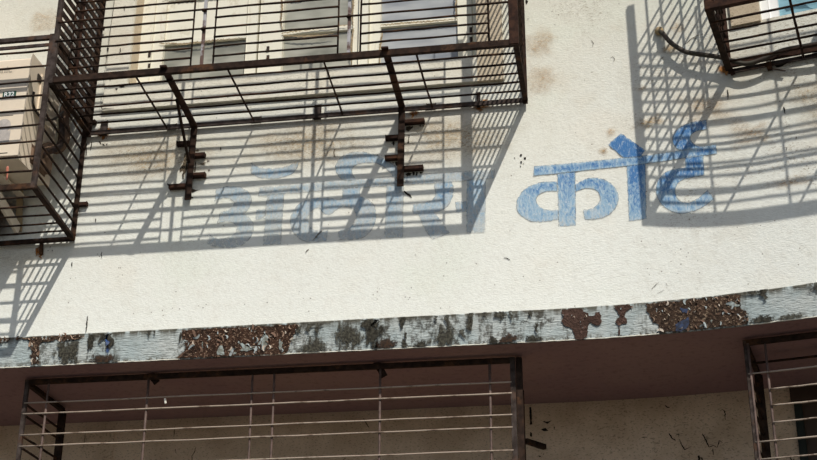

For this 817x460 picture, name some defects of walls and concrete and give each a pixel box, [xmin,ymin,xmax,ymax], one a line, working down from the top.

peeling [0,333,84,366]
peeling [178,323,299,358]
peeling [561,308,602,340]
peeling [646,293,749,332]